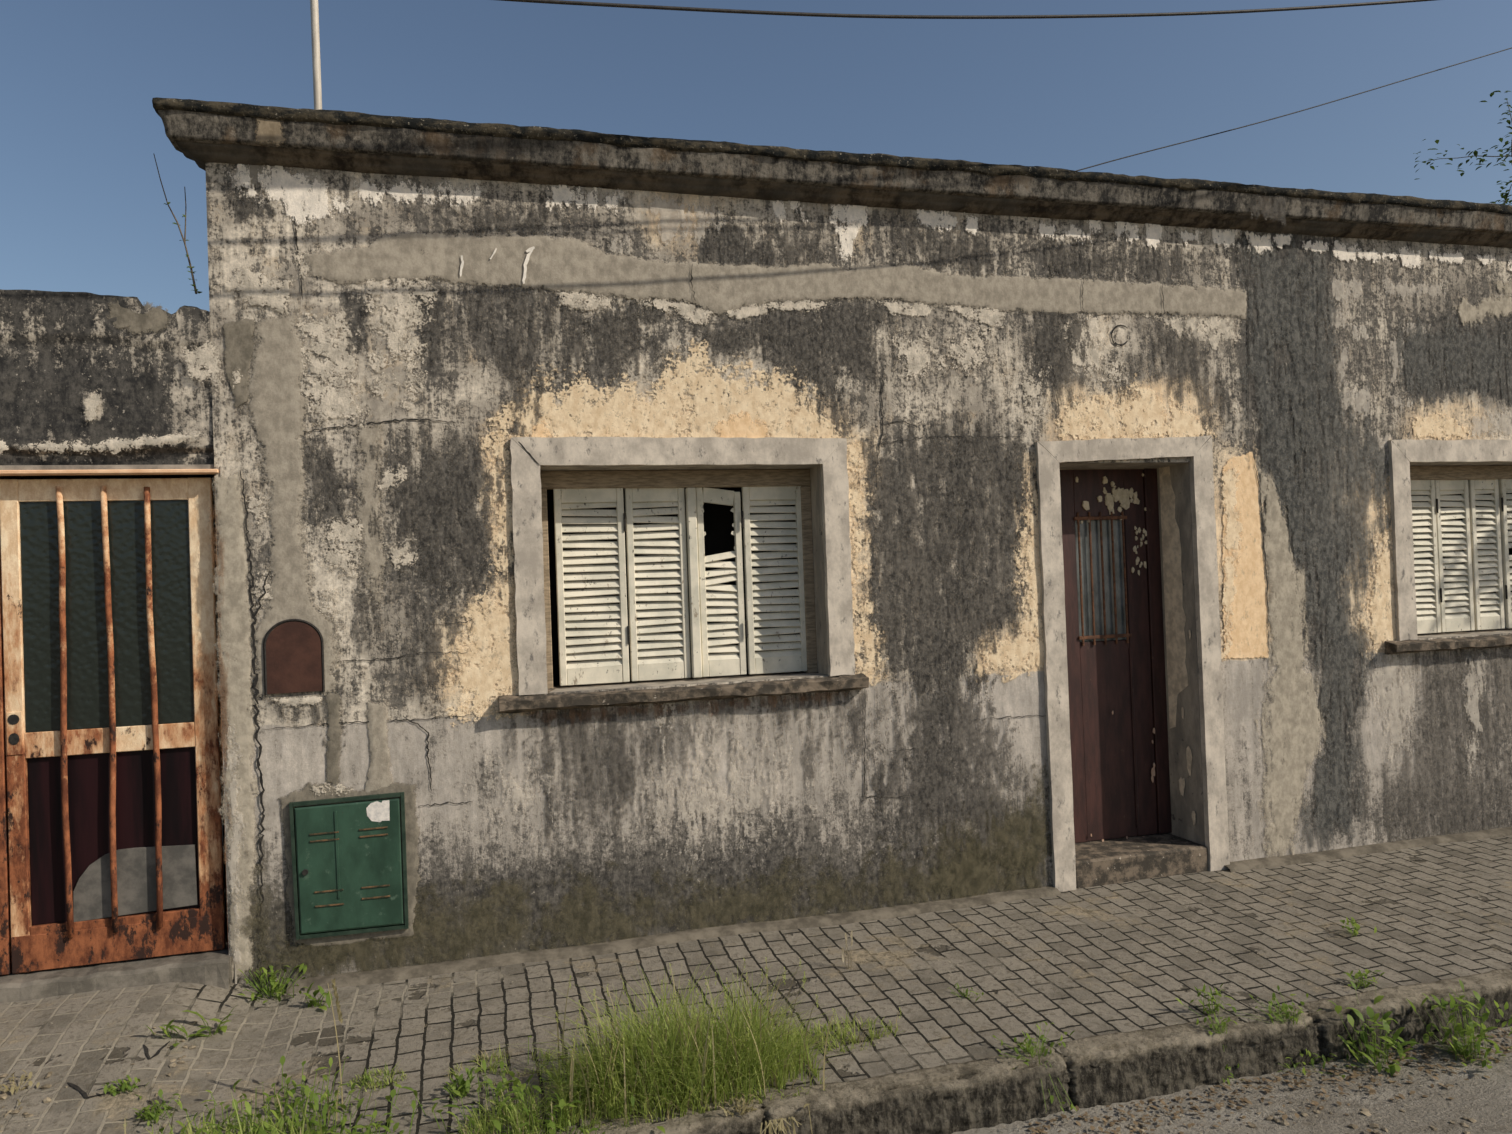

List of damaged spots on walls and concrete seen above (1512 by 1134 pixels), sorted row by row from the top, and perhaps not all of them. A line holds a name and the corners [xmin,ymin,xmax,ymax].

leakage [245,492,269,524]
leakage [251,570,273,608]
crack [240,470,473,968]
leakage [277,194,1512,979]
peeling [1080,466,1191,743]